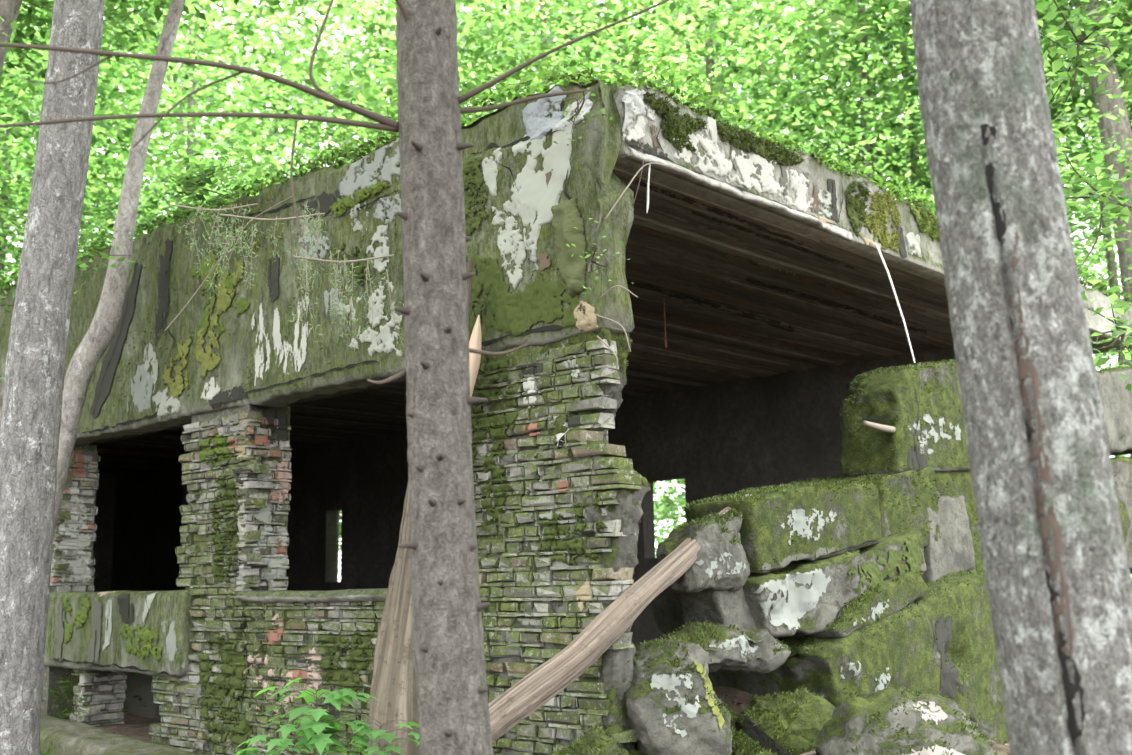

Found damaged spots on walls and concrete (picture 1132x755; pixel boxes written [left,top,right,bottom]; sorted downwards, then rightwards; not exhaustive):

peeling [482,85,593,289]
peeling [622,100,655,141]
peeling [673,116,833,228]
peeling [338,140,402,357]
peeling [905,232,921,258]
peeling [752,568,831,632]